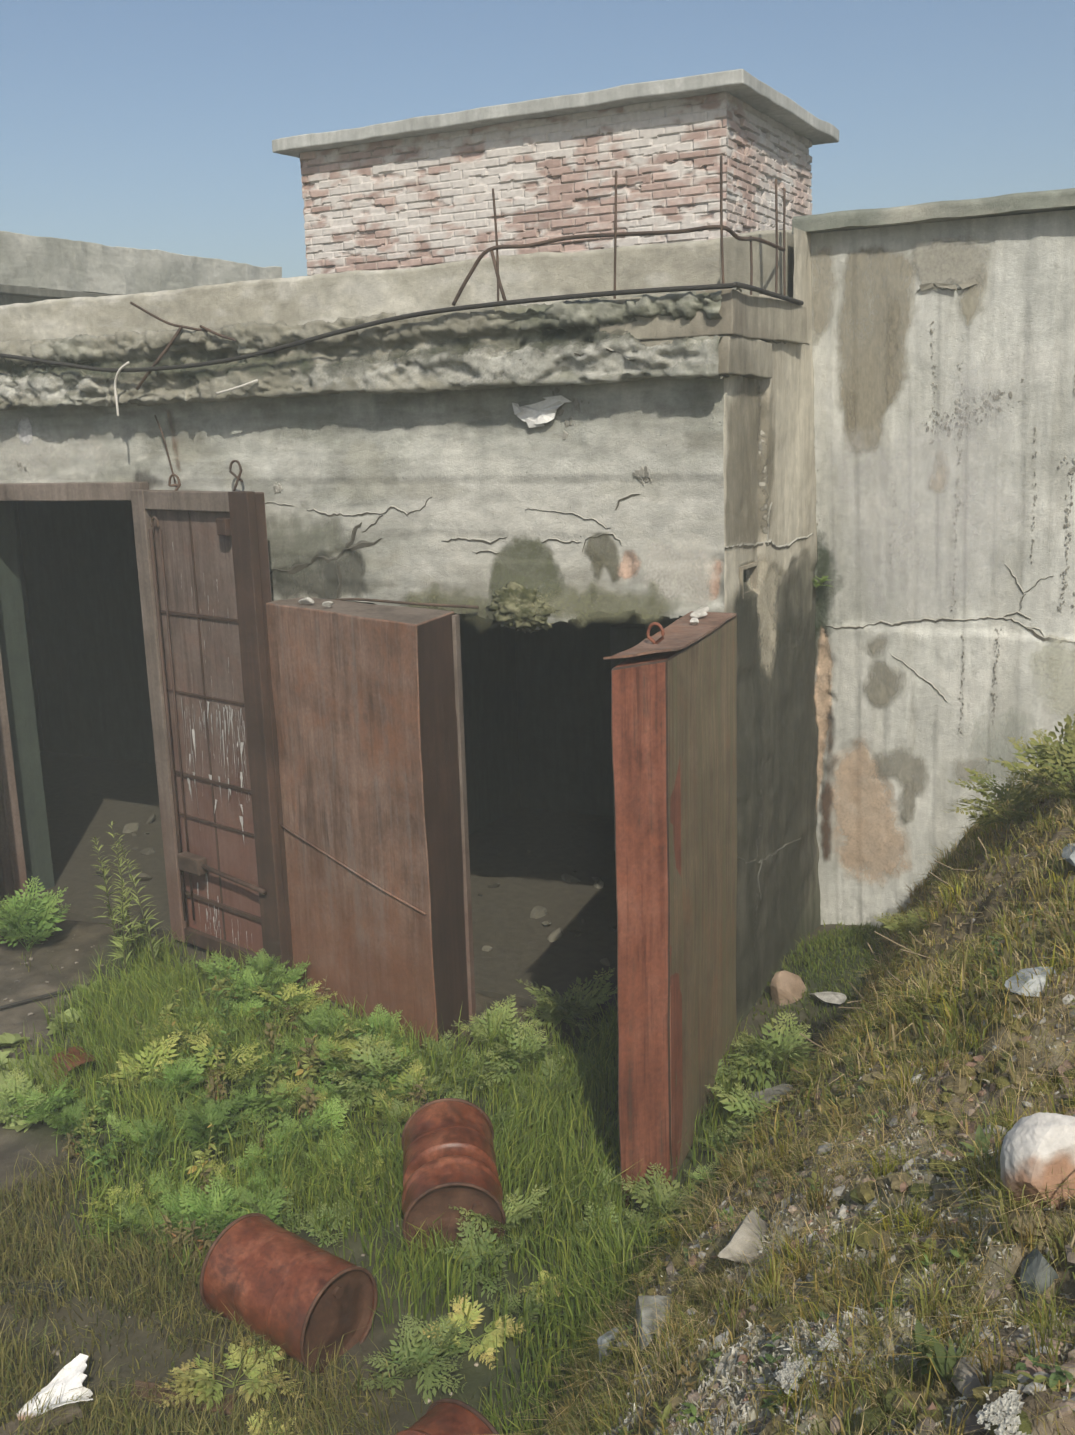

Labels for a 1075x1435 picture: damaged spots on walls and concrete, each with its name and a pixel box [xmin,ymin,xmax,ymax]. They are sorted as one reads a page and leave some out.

water stain [811,248,912,451]
flaking render [512,395,571,428]
water stain [726,378,774,543]
water stain [266,520,364,600]
crack [265,497,431,599]
crack [441,493,640,554]
water stain [586,533,619,589]
water stain [865,638,901,706]
crack [826,564,1075,702]
water stain [735,562,819,1012]
water stain [872,750,925,822]